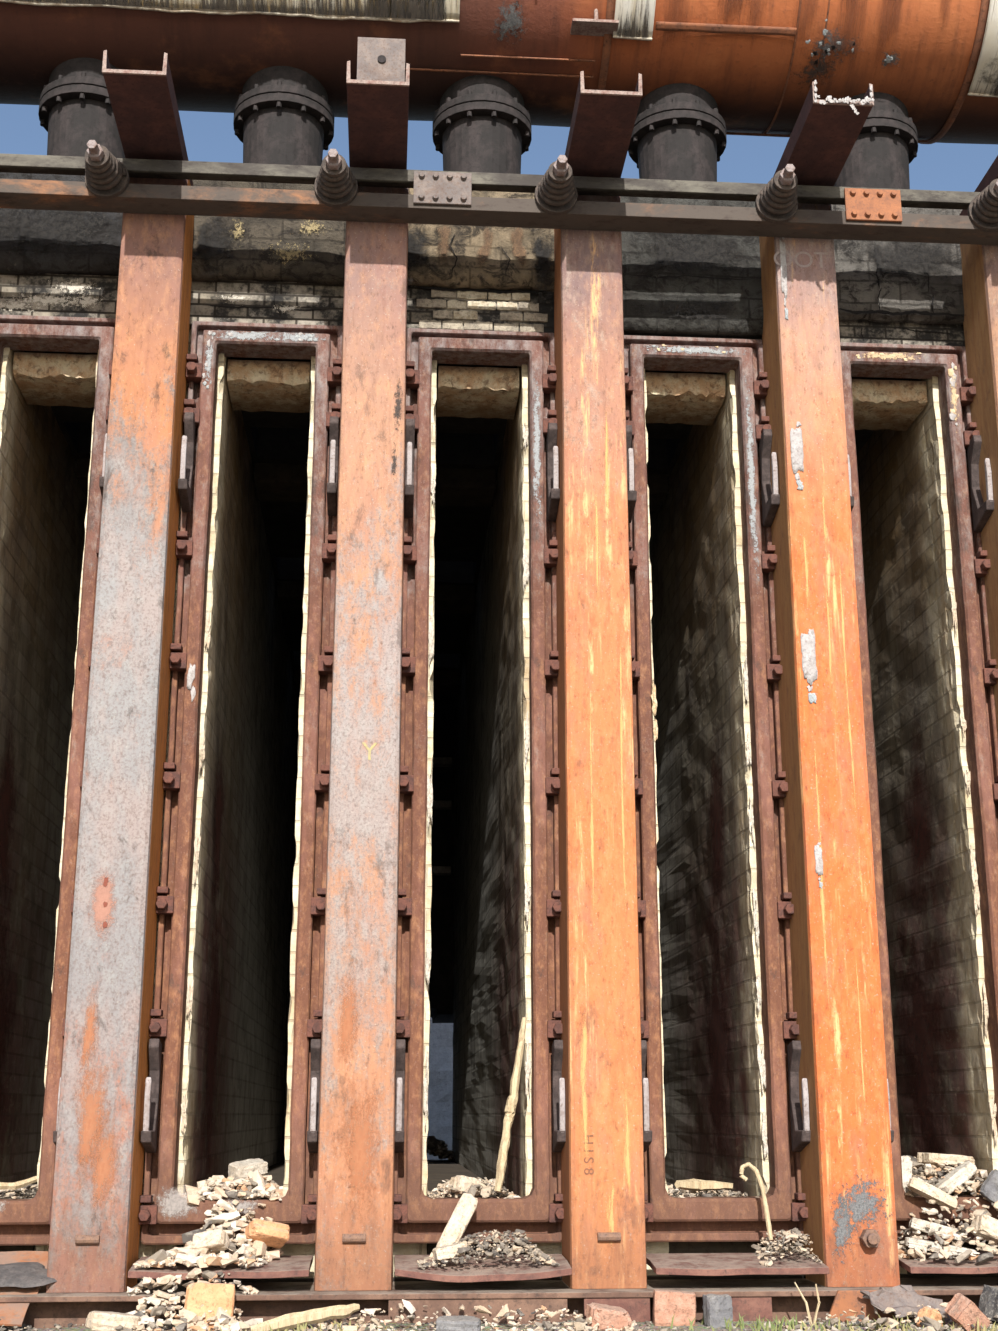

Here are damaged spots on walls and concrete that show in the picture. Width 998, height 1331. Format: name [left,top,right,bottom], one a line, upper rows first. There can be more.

leakage [13,0,447,20]
peeling [796,19,875,115]
peeling [790,422,804,490]
peeling [800,629,818,704]
rust [826,577,847,675]
leakage [902,750,934,908]
rust [92,876,116,937]
rust [78,1005,116,1206]
rust [580,1027,588,1152]
leakage [896,945,947,1153]
rust [607,1093,631,1232]
peeling [828,1175,894,1264]